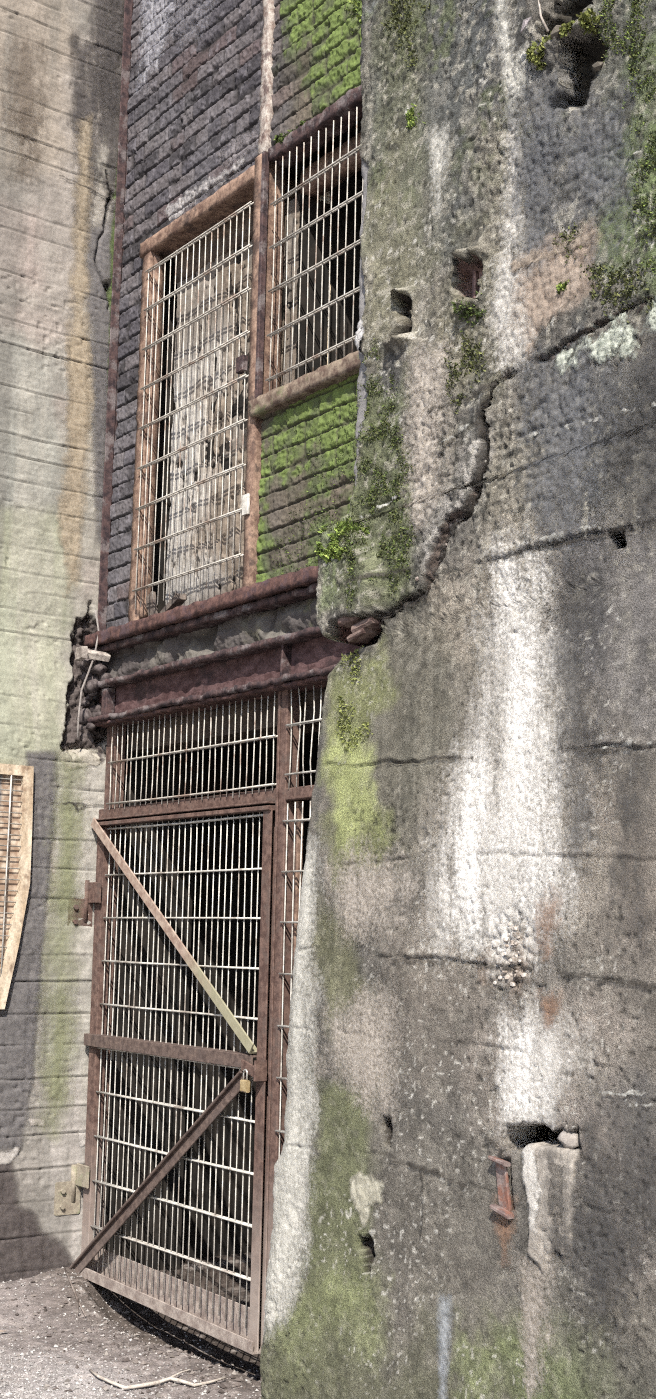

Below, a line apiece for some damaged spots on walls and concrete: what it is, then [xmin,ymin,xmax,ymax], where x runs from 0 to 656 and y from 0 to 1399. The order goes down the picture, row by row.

water stain [493,0,623,540]
crack [344,296,656,656]
spalling [337,615,383,646]
spalling [55,614,112,792]
water stain [431,543,576,967]
water stain [498,1013,576,1141]
water stain [522,1145,541,1231]
peeling [523,1140,582,1270]
water stain [440,1299,449,1399]
efflorescence [520,1261,554,1396]